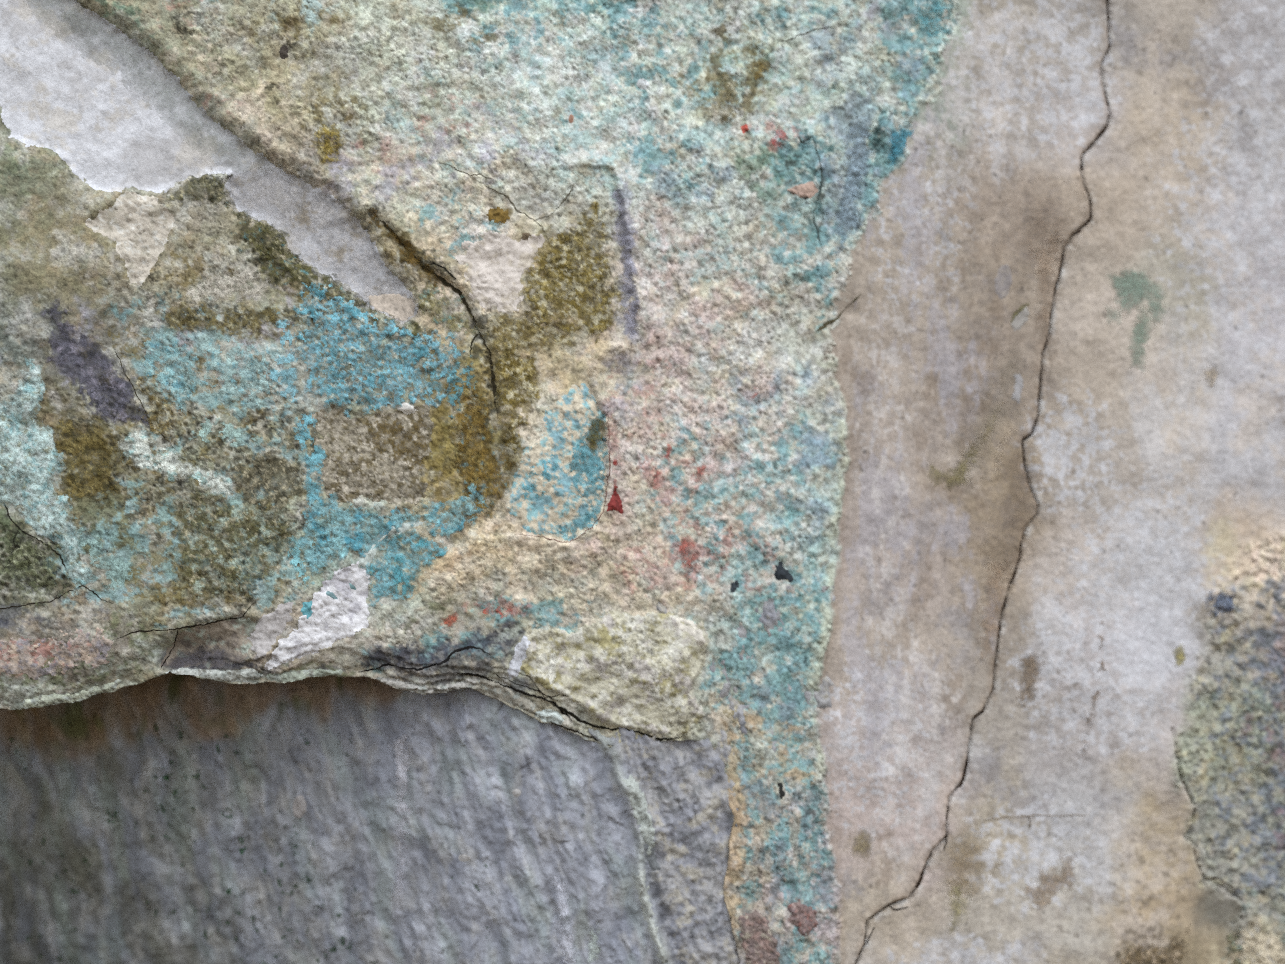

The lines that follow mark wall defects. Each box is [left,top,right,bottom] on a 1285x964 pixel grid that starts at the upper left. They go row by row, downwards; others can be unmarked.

flaking render [0,0,484,683]
crack [378,218,498,415]
crack [815,295,860,334]
crack [855,0,1110,964]
flaking render [0,627,122,709]
flaking render [376,610,713,738]
peeling [621,774,670,964]
crack [1189,838,1237,895]